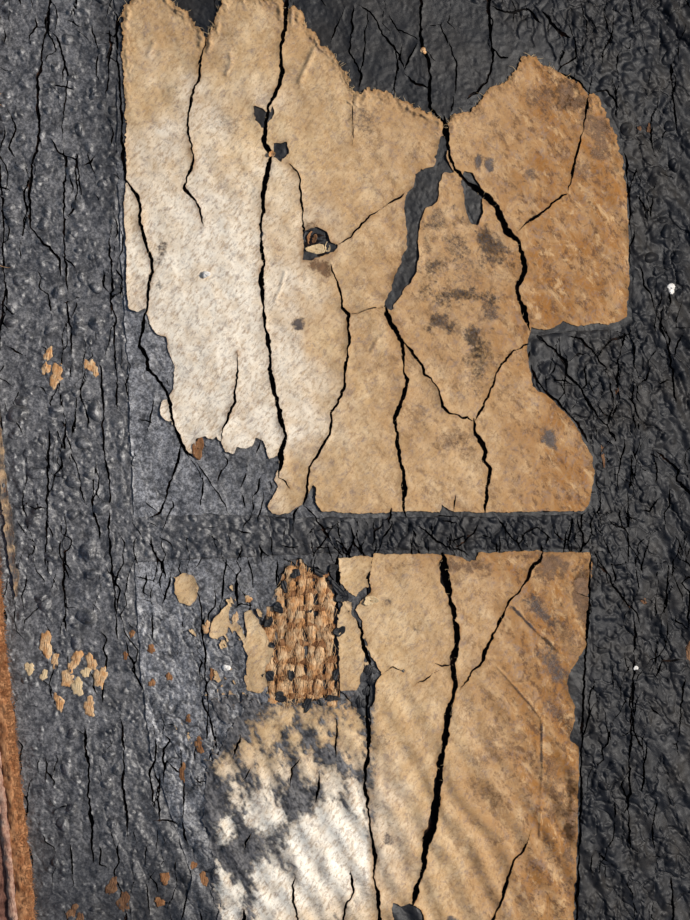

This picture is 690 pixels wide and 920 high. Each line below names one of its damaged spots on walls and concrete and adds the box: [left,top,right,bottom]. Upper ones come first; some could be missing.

crack [0,165,26,356]
crack [25,394,72,632]
crack [27,0,83,355]
peeling [160,399,173,424]
peeling [192,437,204,460]
peeling [256,558,349,713]
crack [99,0,631,920]
peeling [363,596,379,606]
crack [658,308,681,402]
crack [83,729,94,863]
leakage [202,690,376,920]
crack [574,558,680,920]